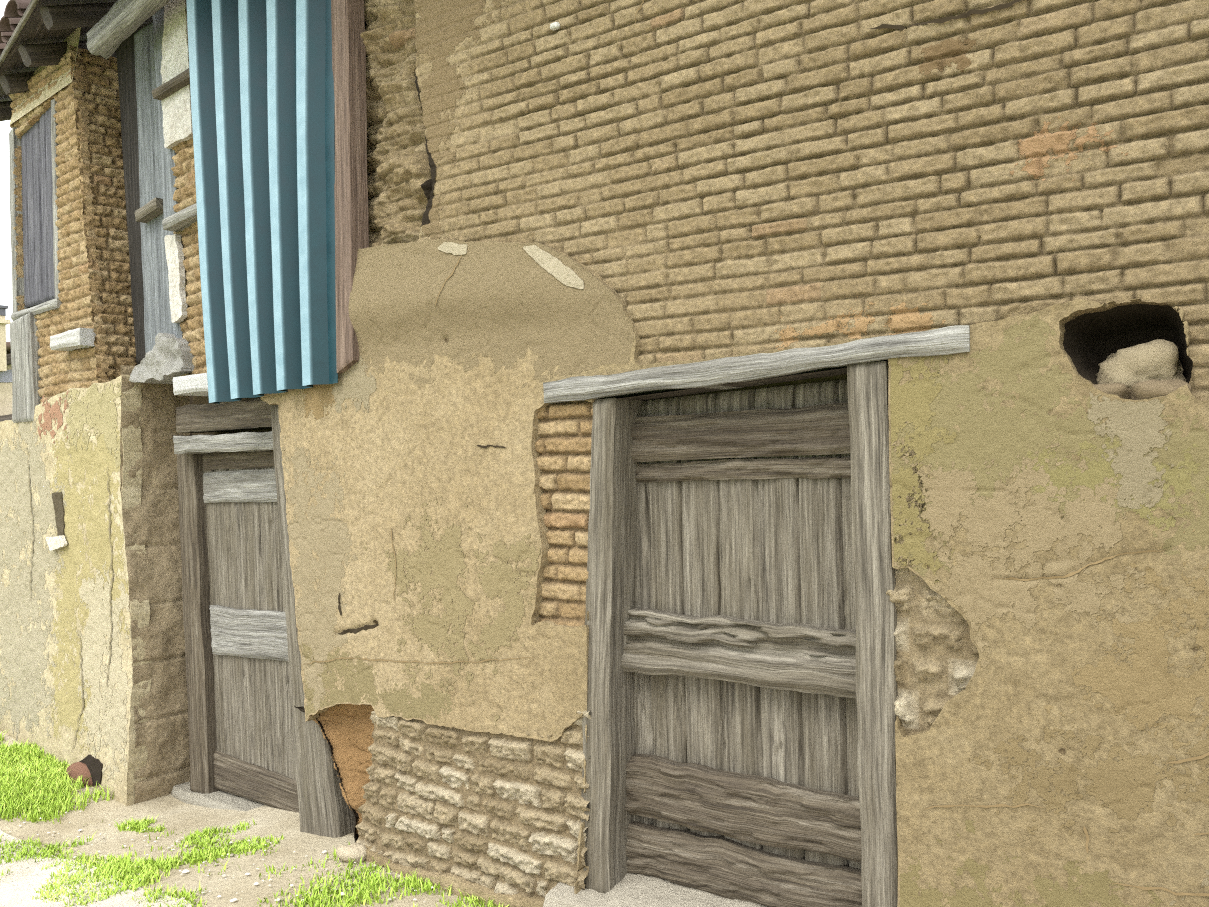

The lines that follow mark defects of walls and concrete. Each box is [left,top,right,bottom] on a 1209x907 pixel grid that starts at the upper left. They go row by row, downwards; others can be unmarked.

flaking render [414,0,509,177]
flaking render [422,192,468,255]
spalling [523,245,584,289]
flaking render [535,398,602,626]
damp [891,391,1183,673]
flaking render [886,566,979,735]
flaking render [313,703,591,899]